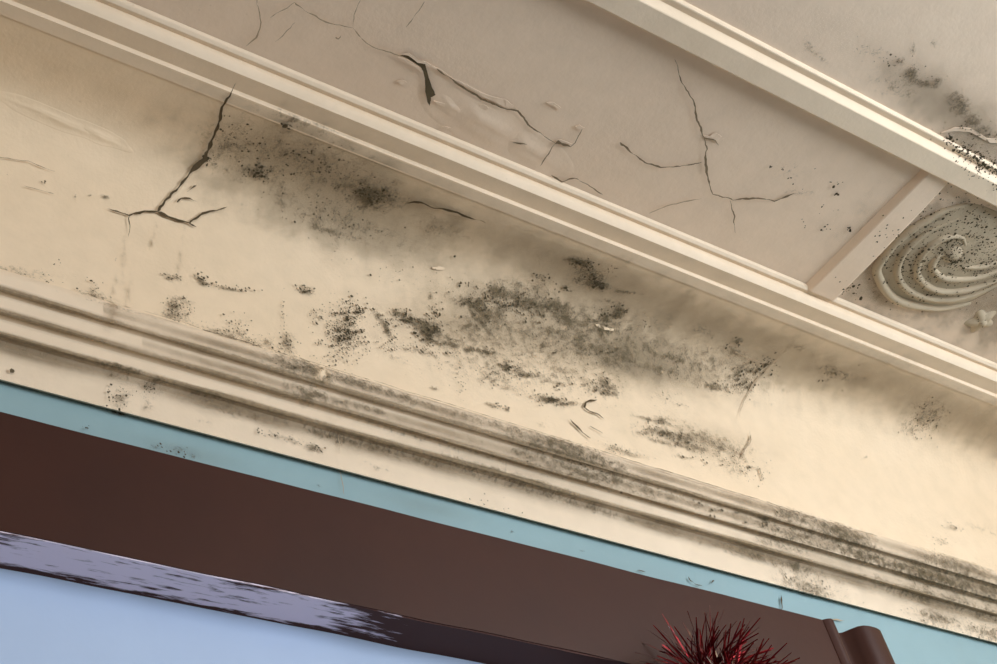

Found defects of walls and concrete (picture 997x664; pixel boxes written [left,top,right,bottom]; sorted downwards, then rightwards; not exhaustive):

crack [248,0,400,56]
water stain [874,49,940,88]
crack [110,85,235,235]
water stain [202,115,397,240]
crack [437,69,601,194]
crack [620,61,794,226]
water stain [930,93,997,191]
water stain [835,183,997,324]
water stain [0,258,997,638]